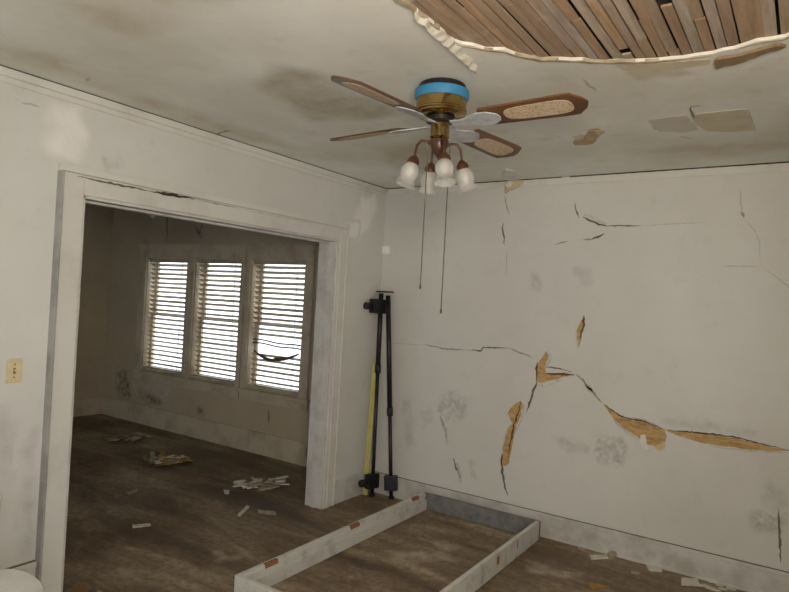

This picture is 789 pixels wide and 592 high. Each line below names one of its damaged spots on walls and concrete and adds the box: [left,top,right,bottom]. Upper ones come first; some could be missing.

spalling [393,0,789,74]
damp [238,52,411,126]
peeling [573,128,605,145]
peeling [648,105,756,139]
crack [77,176,321,225]
crack [555,205,705,245]
crack [725,191,789,288]
crack [395,343,531,357]
spalling [575,315,585,349]
crack [576,374,602,403]
spalling [500,351,575,496]